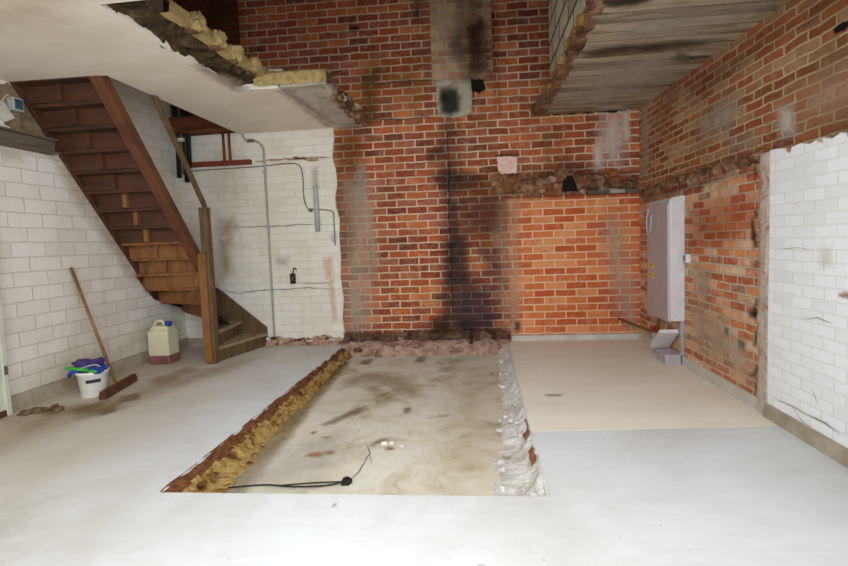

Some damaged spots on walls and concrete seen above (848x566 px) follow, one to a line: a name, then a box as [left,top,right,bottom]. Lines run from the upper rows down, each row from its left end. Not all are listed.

spalling [107,0,276,90]
spalling [539,170,636,197]
crack [777,390,839,434]